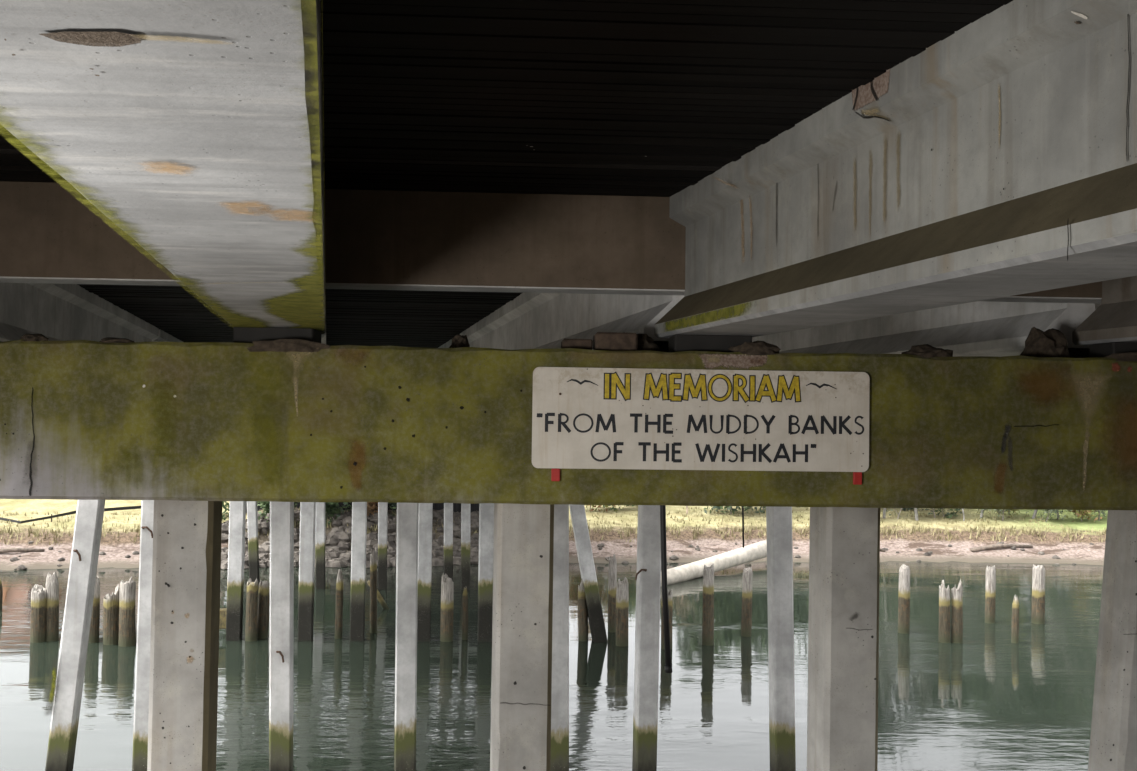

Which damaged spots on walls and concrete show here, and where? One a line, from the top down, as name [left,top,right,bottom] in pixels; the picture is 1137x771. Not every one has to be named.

spalling [39,31,223,47]
spalling [852,69,890,121]
crack [28,387,36,496]